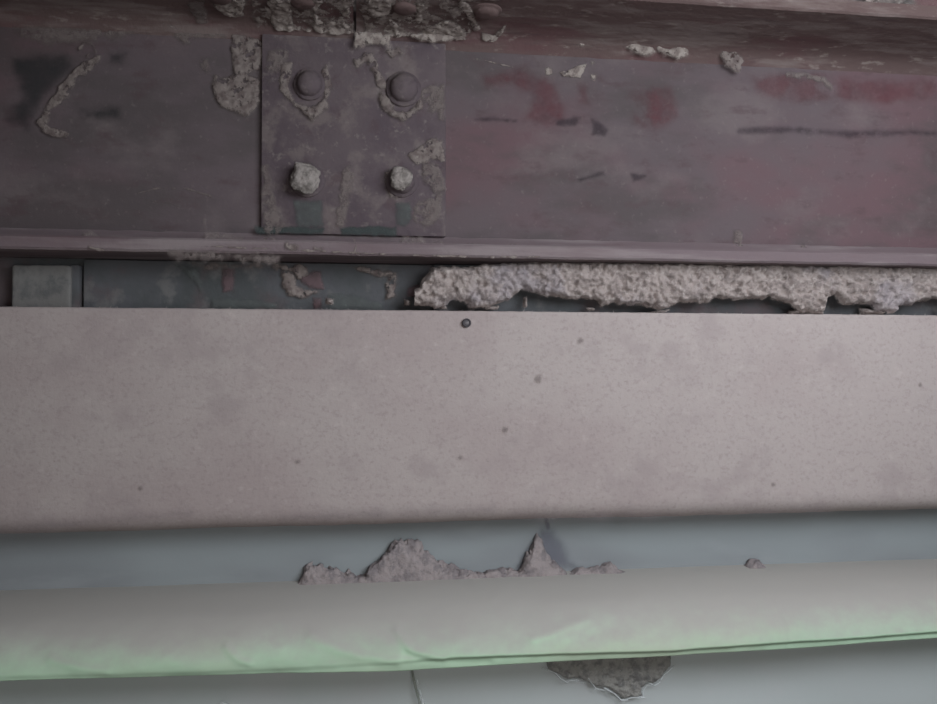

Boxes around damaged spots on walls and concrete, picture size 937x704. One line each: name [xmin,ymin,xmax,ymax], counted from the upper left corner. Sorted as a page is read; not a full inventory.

peeling [213,0,246,18]
peeling [267,0,293,32]
peeling [175,33,332,121]
peeling [306,0,505,121]
peeling [408,138,446,225]
peeling [170,251,277,309]
spalling [236,255,937,315]
crack [411,670,424,704]
spalling [542,656,674,701]